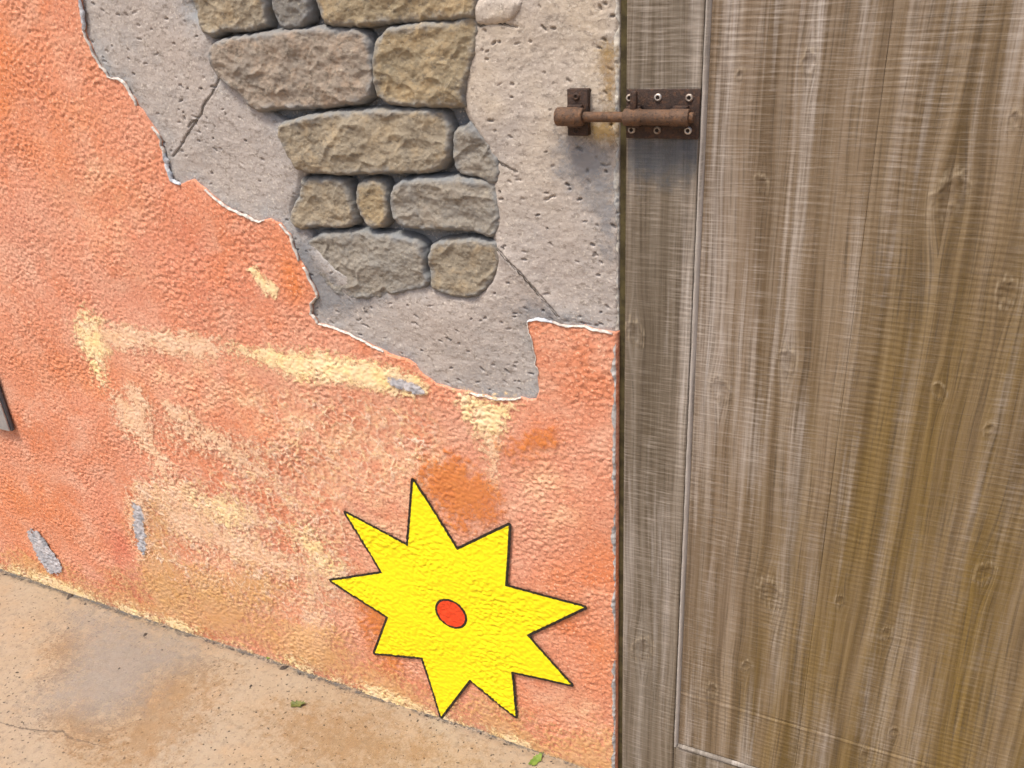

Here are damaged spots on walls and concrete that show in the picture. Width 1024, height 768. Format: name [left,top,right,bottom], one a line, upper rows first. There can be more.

crack [173,79,219,156]
crack [497,250,558,318]
peeling [78,0,621,652]
peeling [27,529,62,575]